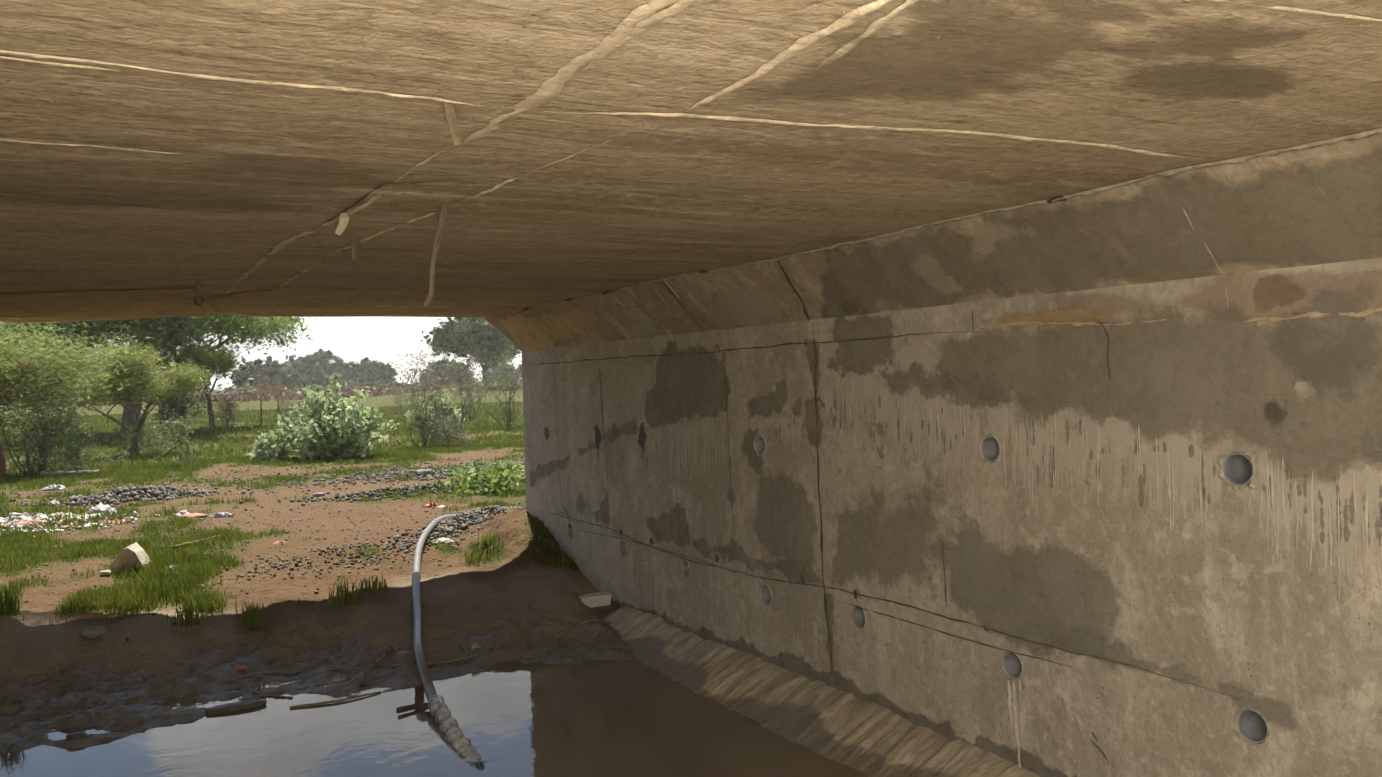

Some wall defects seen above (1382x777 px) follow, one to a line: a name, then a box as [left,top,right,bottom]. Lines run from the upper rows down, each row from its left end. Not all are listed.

crack [320,177,483,226]
leakage [530,151,1382,777]